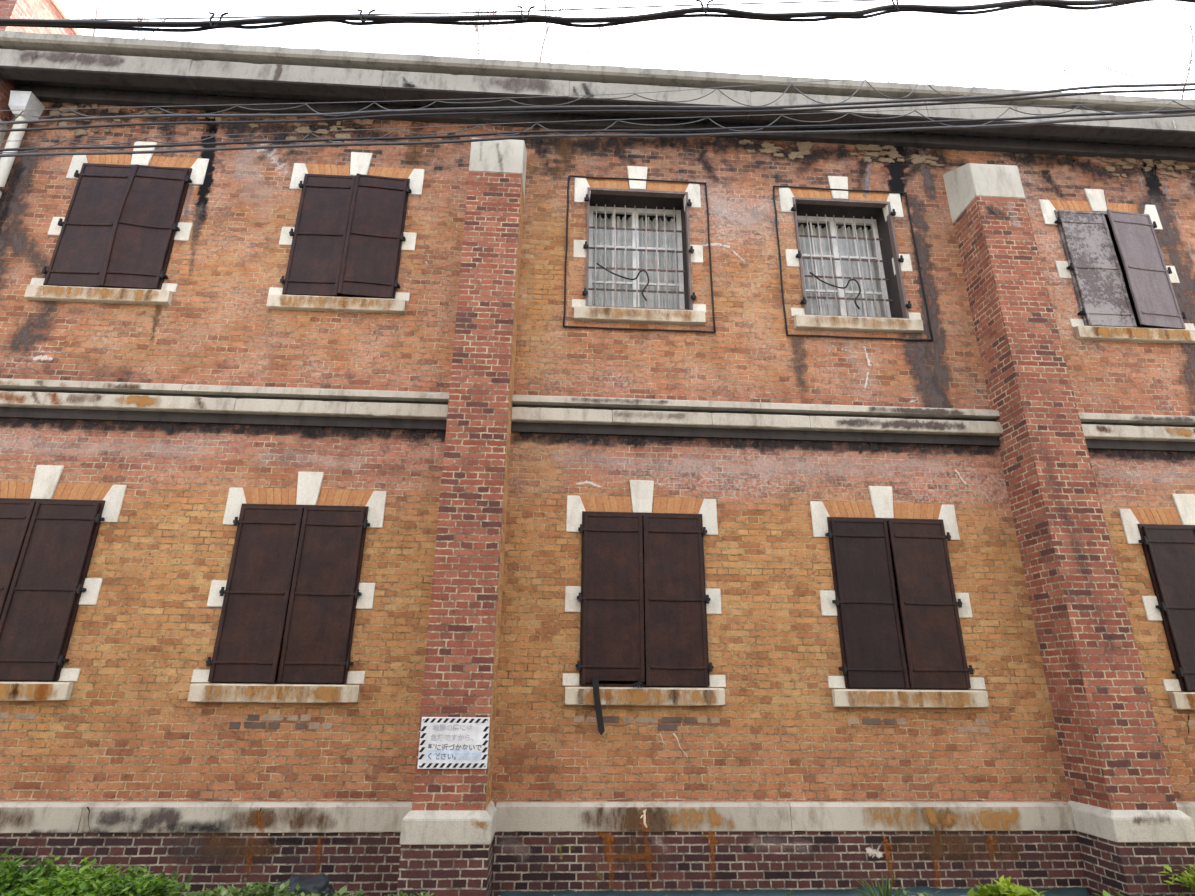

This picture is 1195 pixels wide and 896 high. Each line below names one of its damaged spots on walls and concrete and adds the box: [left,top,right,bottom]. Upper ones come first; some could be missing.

leakage [1138,161,1195,329]
leakage [1134,343,1195,436]
corrosion [205,685,342,702]
corrosion [578,689,716,705]